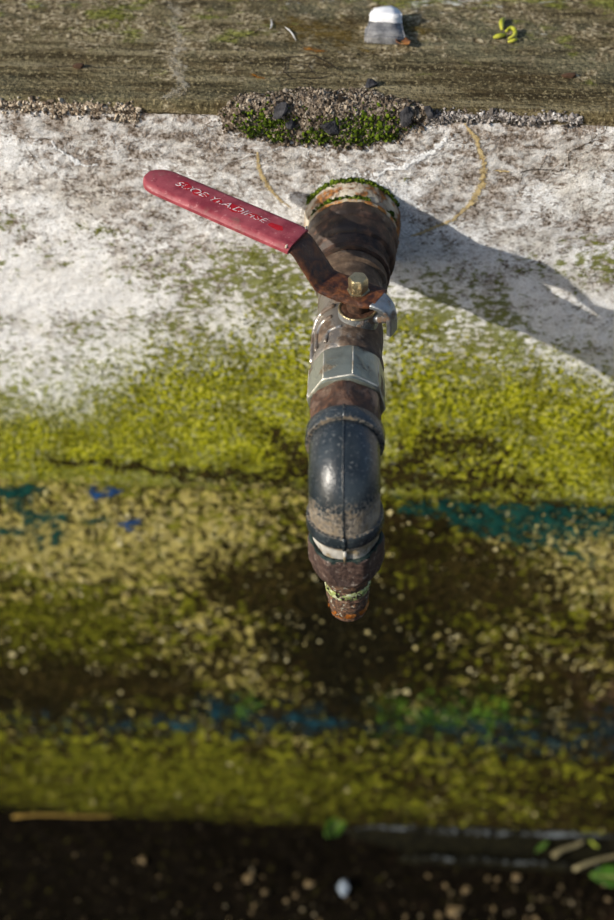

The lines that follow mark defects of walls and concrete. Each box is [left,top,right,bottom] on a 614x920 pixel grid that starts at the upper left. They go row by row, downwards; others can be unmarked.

leakage [51,140,97,167]
leakage [296,137,447,264]
leakage [188,423,614,795]